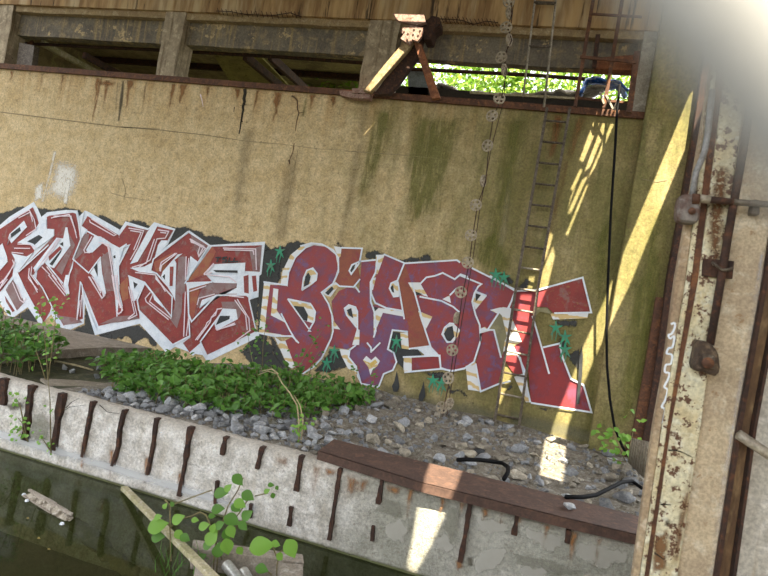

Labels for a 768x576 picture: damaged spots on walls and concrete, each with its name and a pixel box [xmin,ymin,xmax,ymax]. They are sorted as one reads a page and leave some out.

corrosion [94,78,112,111]
crack [1,89,447,236]
corrosion [644,119,728,576]